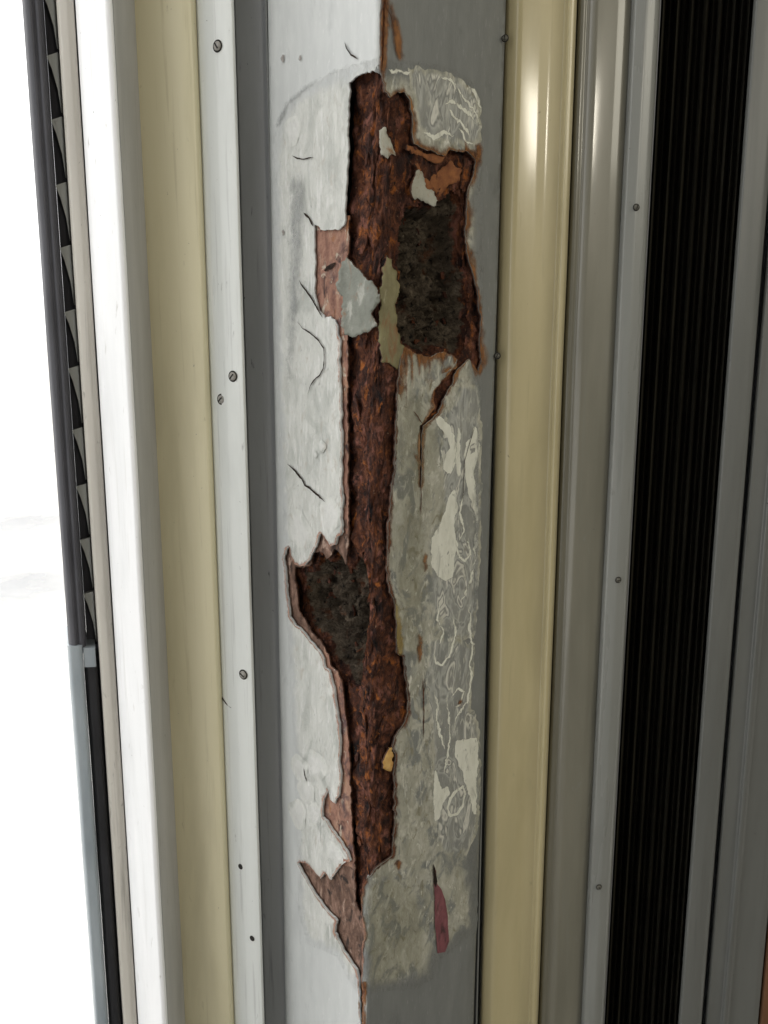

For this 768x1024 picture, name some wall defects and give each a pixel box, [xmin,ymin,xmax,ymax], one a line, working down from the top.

peeling [389,65,482,147]
peeling [409,170,438,207]
crack [298,282,325,392]
crack [289,465,325,502]
rust [282,0,487,1024]
peeling [285,215,365,987]
peeling [425,383,483,857]
peeling [433,864,449,953]